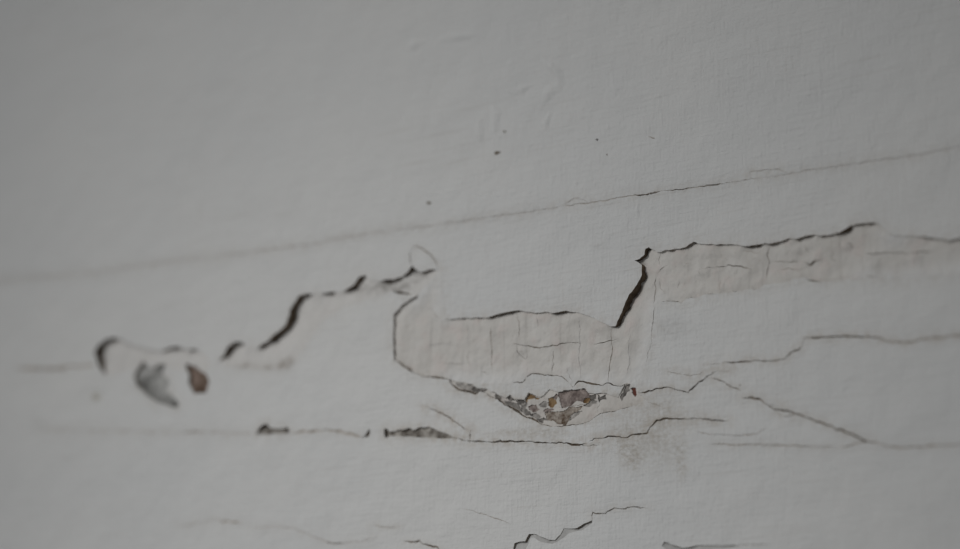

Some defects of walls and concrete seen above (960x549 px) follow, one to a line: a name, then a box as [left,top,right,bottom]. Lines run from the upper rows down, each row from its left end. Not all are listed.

crack [0,146,958,282]
peeling [94,222,960,427]
spalling [256,424,289,435]
spalling [384,427,454,439]
crack [428,335,960,449]